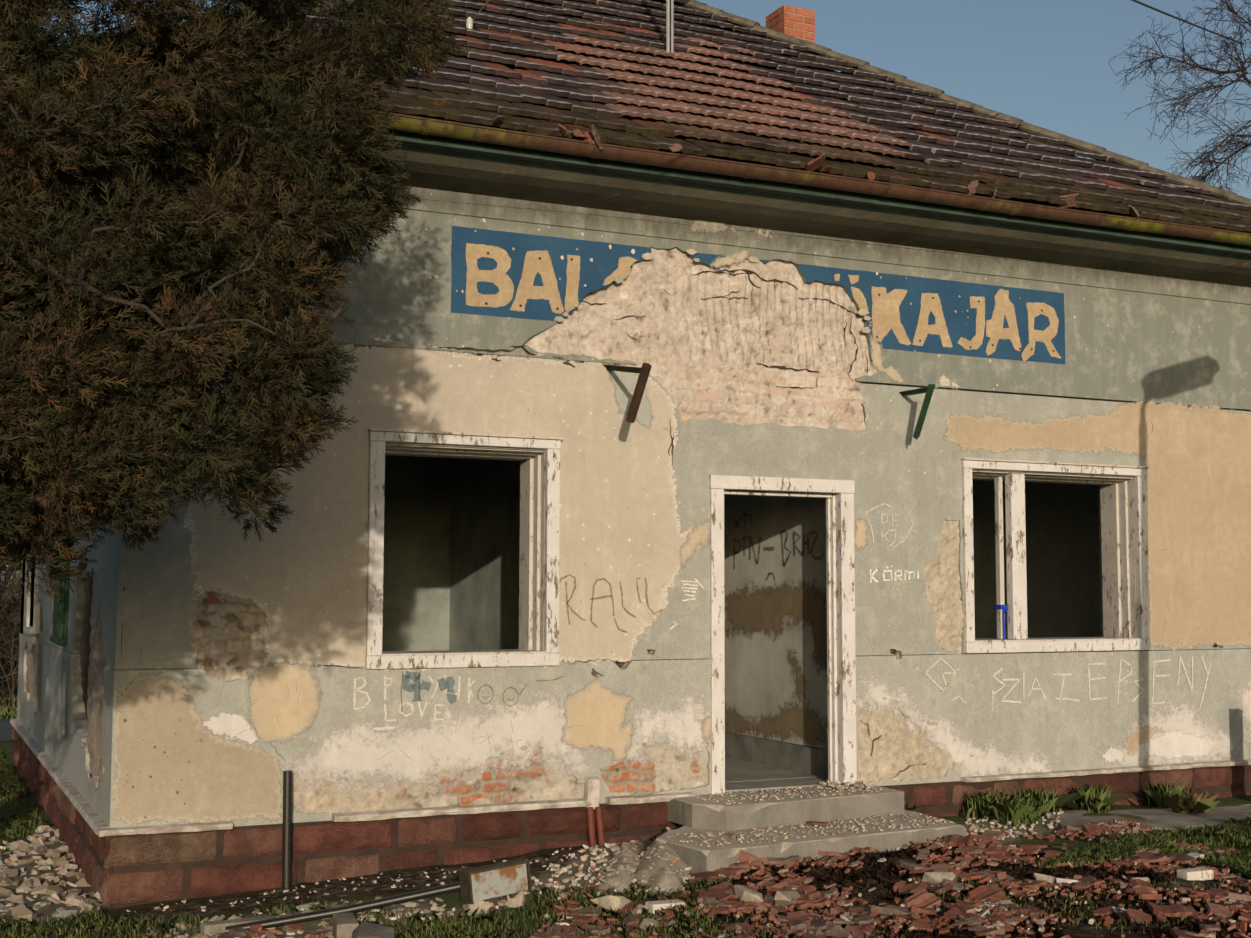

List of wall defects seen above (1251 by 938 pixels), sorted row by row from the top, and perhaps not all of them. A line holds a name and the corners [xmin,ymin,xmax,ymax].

peeling [691,220,778,239]
crack [581,300,646,340]
crack [694,269,868,424]
peeling [77,247,904,827]
flaking render [923,517,964,655]
peeling [943,400,1251,650]
damp [284,686,592,797]
flaking render [857,697,974,783]
efflorescence [1094,676,1251,766]